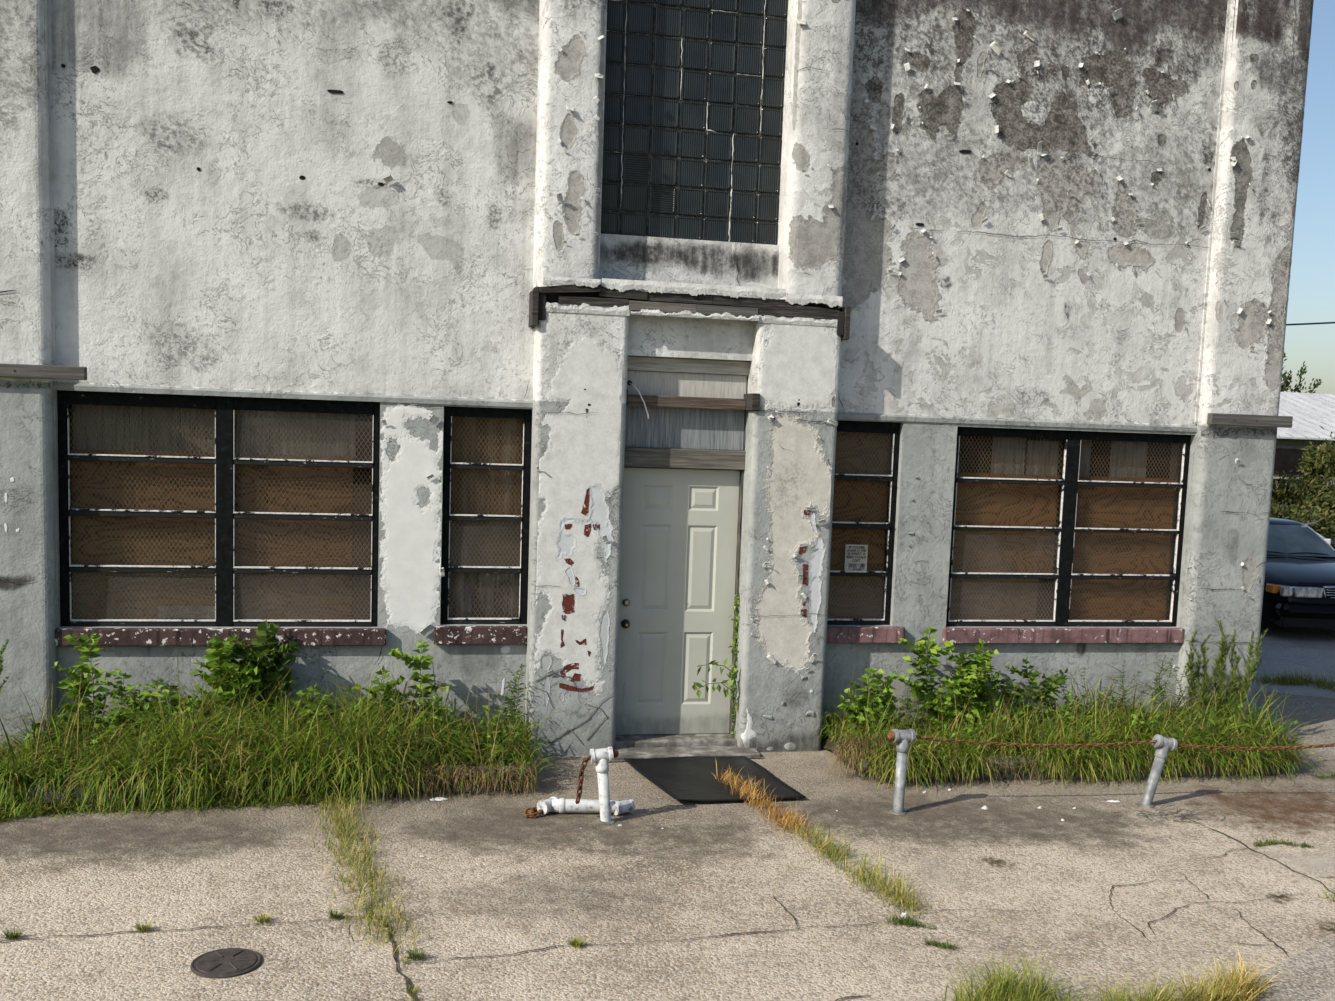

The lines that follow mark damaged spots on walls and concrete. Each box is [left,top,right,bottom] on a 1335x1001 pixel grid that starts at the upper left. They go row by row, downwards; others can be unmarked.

water stain [178,29,213,56]
water stain [603,242,779,288]
peeling [543,0,1190,674]
water stain [853,0,1314,266]
peeling [1185,192,1211,246]
peeling [1229,134,1254,248]
peeling [1215,245,1292,390]
peeling [379,403,445,636]
peeling [534,335,623,707]
crack [0,907,564,1001]
crack [596,895,877,945]
crack [1109,819,1333,957]